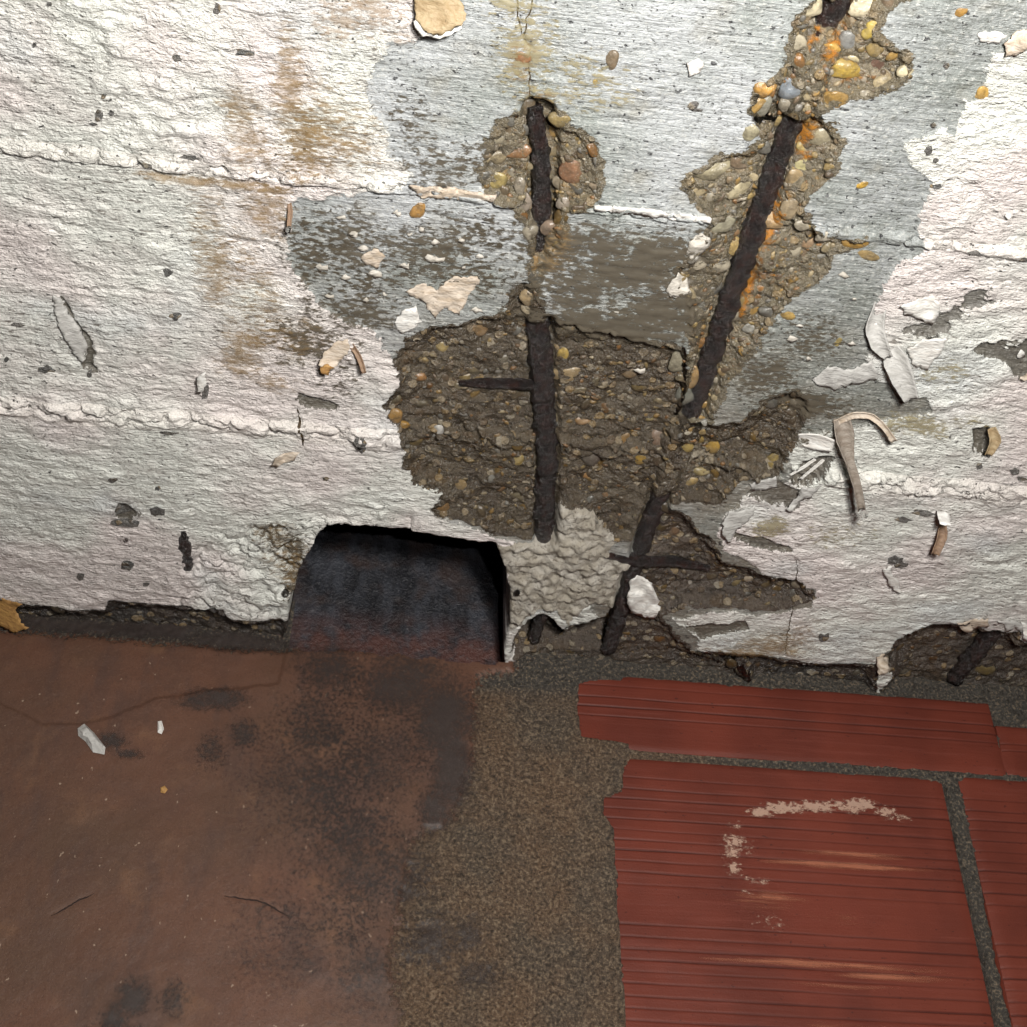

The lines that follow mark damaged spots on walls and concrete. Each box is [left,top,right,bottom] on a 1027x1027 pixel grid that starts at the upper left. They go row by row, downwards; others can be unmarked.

crack [517,0,533,40]
corrosion [807,0,851,60]
peeling [285,0,1027,692]
corrosion [681,113,817,419]
peeling [270,452,300,468]
corrosion [600,491,711,655]